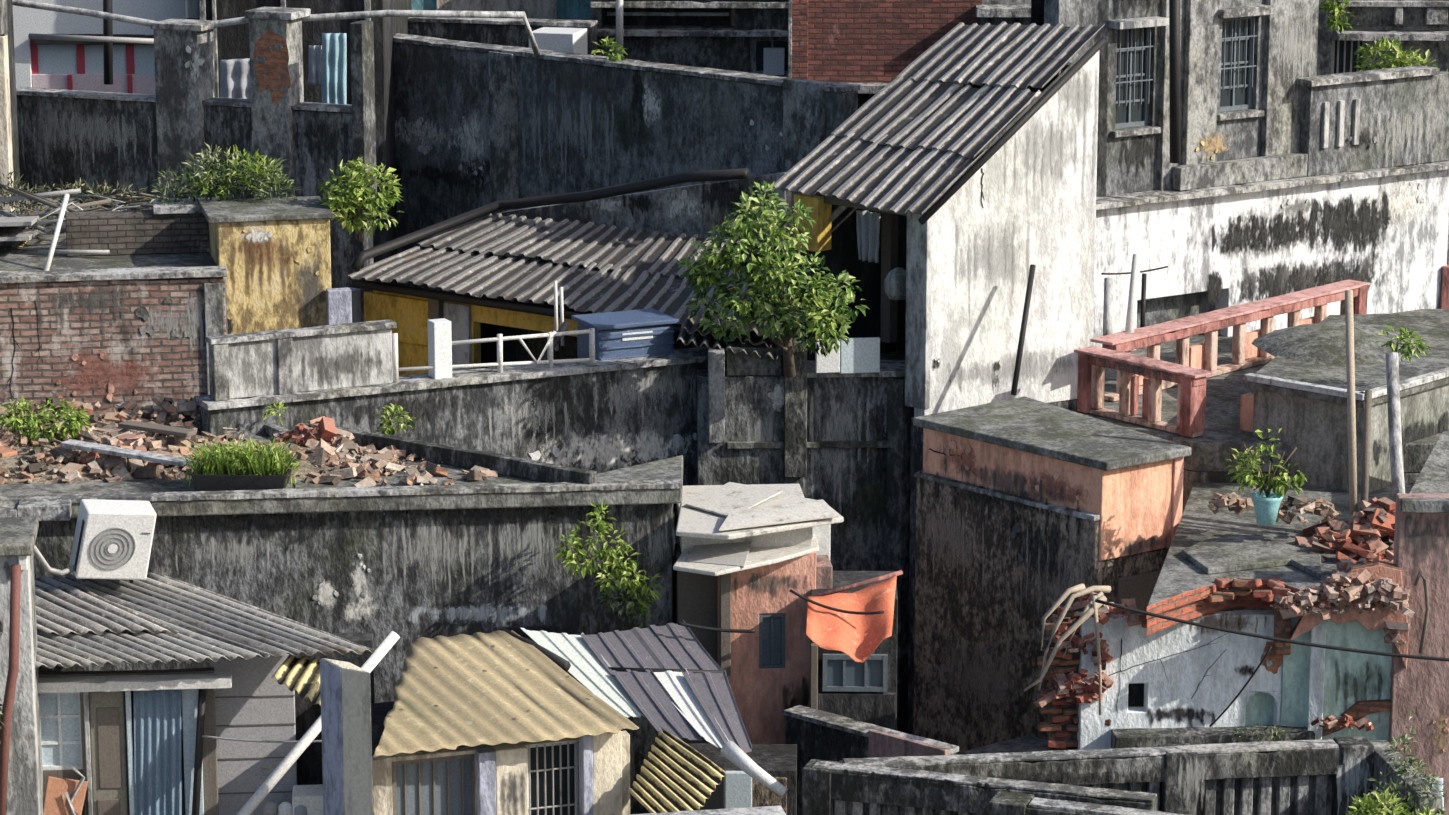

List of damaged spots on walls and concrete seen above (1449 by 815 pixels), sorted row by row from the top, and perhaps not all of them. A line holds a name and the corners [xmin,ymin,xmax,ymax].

spalling [253,30,291,104]
damp [522,66,643,180]
mould [1207,192,1391,304]
damp [172,512,358,570]
damp [379,506,616,624]
damp [920,458,1084,622]
spalling [1236,642,1283,675]